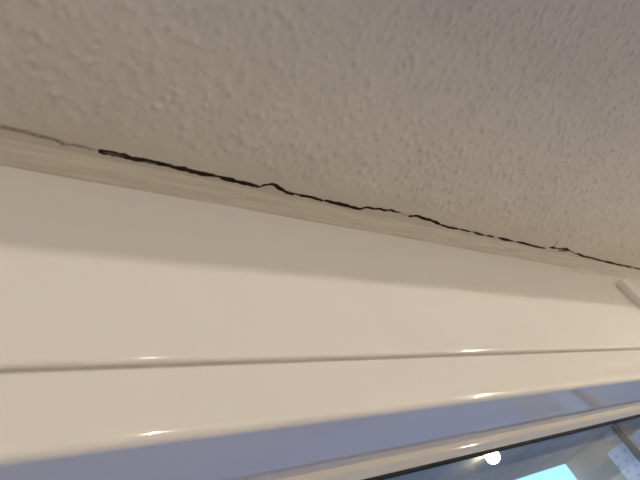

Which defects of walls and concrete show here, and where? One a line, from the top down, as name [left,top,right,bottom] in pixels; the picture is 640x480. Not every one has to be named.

crack [4,126,640,270]